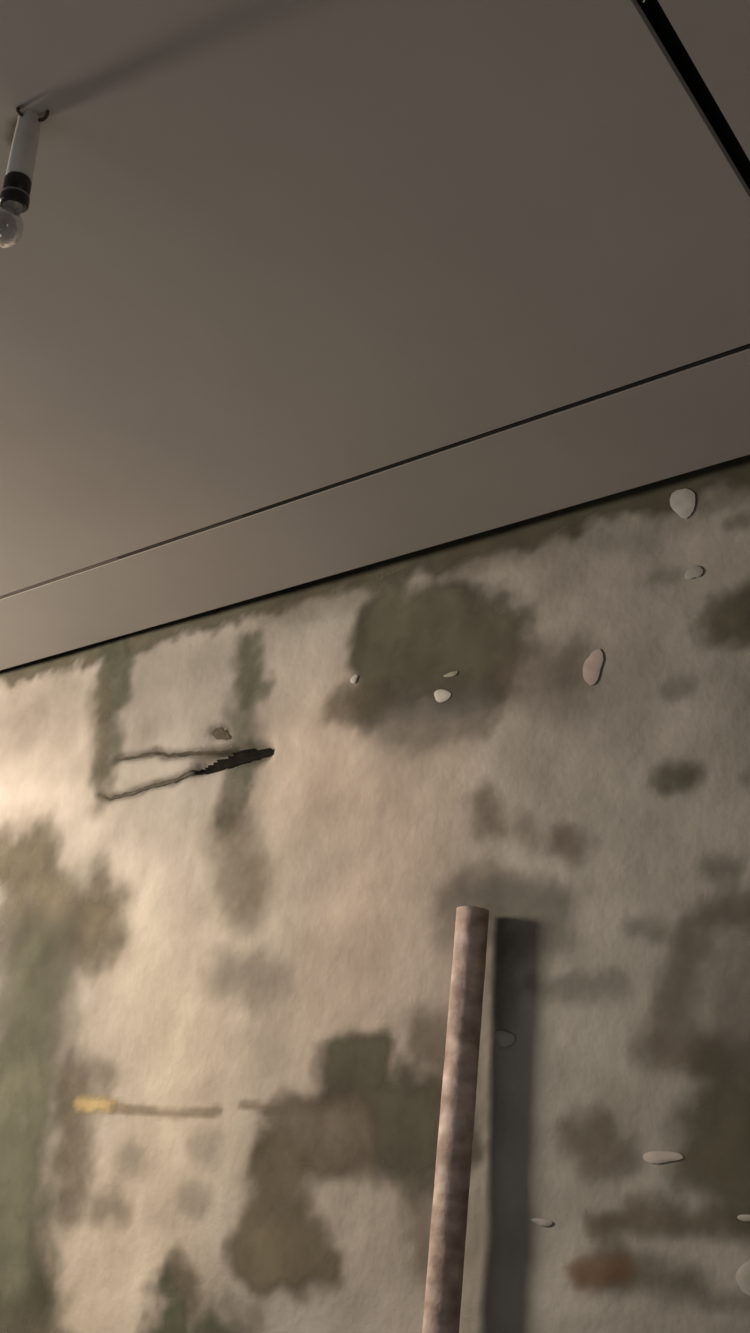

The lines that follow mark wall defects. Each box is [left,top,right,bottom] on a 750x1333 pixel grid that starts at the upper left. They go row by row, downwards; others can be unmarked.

peeling [670,488,695,519]
leakage [0,454,750,777]
peeling [583,649,603,685]
crack [98,727,274,800]
leakage [217,760,261,873]
leakage [0,827,124,1333]
leakage [411,1024,446,1072]
leakage [646,903,750,1228]
peeling [643,1151,683,1164]
corrosion [589,1205,742,1236]
corrosion [572,1260,626,1287]